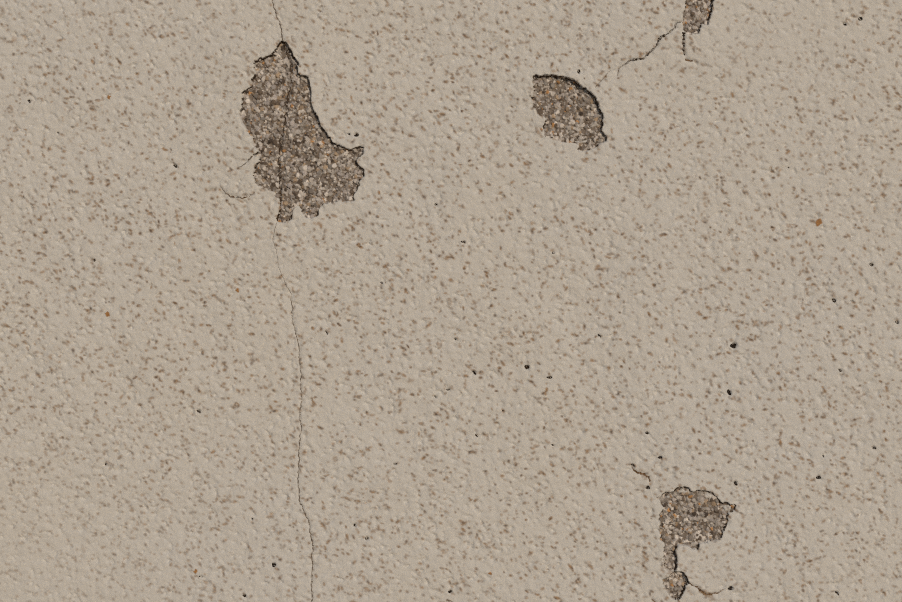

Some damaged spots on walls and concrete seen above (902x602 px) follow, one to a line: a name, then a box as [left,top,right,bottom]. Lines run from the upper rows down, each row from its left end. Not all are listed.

crack [596,22,693,86]
spalling [682,0,714,34]
spalling [239,41,364,223]
spalling [531,74,607,152]
crack [273,223,314,602]
spalling [656,486,736,600]